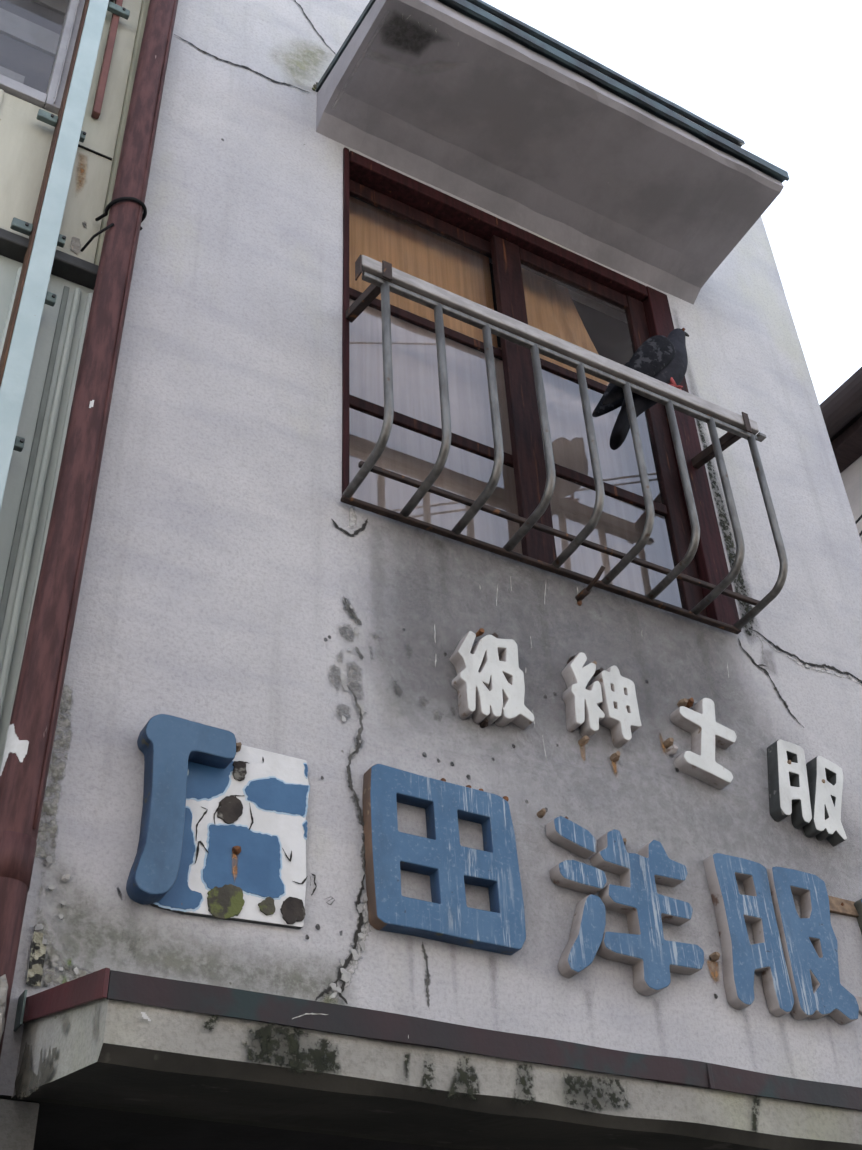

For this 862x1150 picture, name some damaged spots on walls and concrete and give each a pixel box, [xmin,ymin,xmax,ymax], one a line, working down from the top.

crack [294,0,335,53]
leakage [378,14,459,54]
crack [174,34,308,92]
crack [343,596,363,660]
crack [738,628,862,725]
crack [316,685,370,1004]
leakage [242,1024,341,1074]
leakage [421,1061,435,1092]
leakage [448,1057,480,1101]
leakage [513,1064,535,1103]
leakage [564,1074,630,1112]
leakage [752,1095,760,1133]